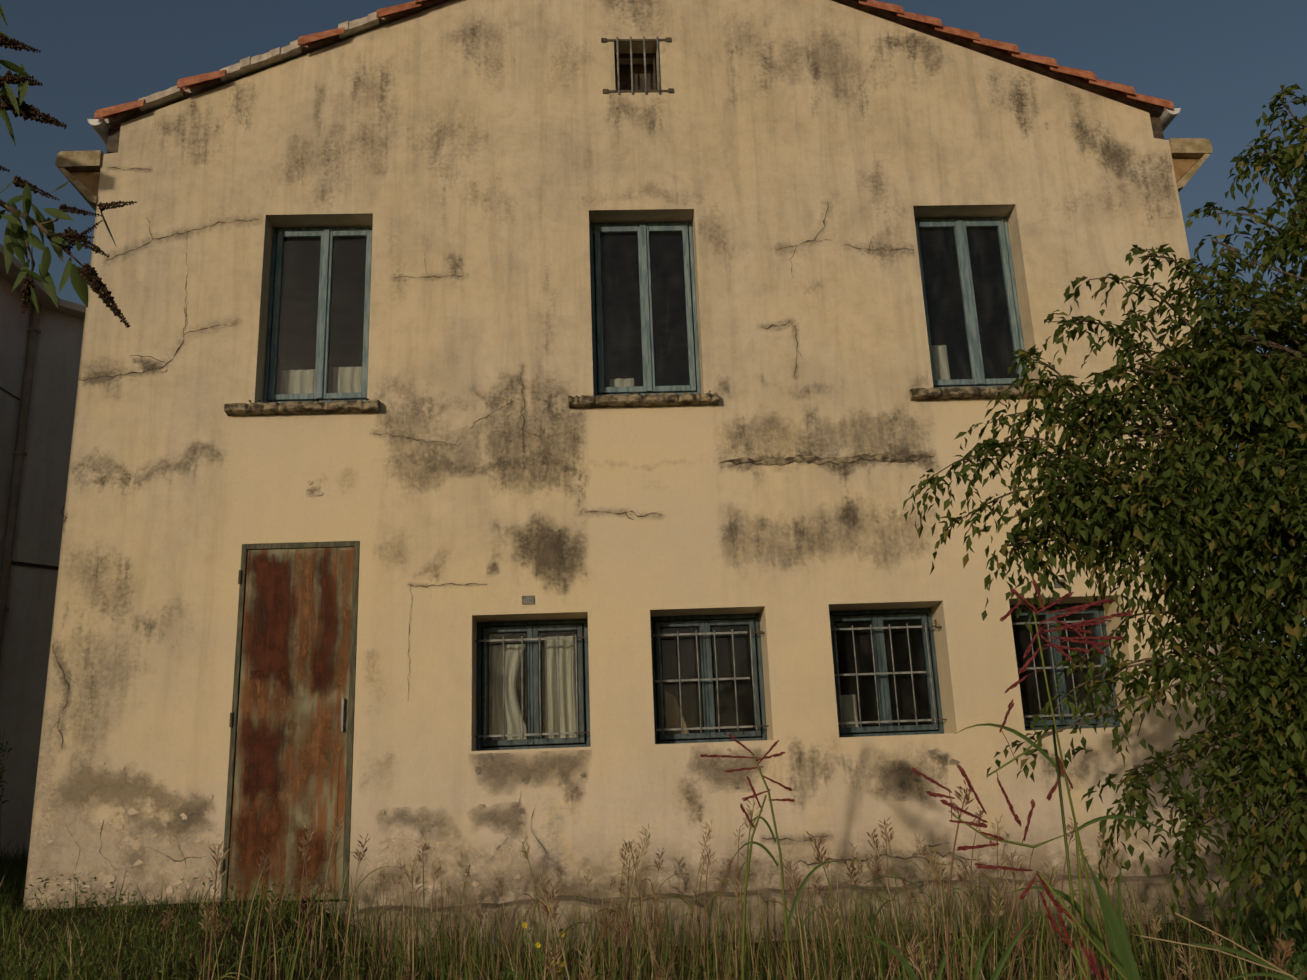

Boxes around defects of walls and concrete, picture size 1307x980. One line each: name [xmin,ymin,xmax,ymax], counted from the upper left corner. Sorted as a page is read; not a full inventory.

crack [78,217,259,381]
crack [780,206,911,278]
rust [243,553,296,700]
rust [309,548,340,694]
crack [408,582,487,693]
water stain [518,520,583,581]
rust [230,717,336,891]